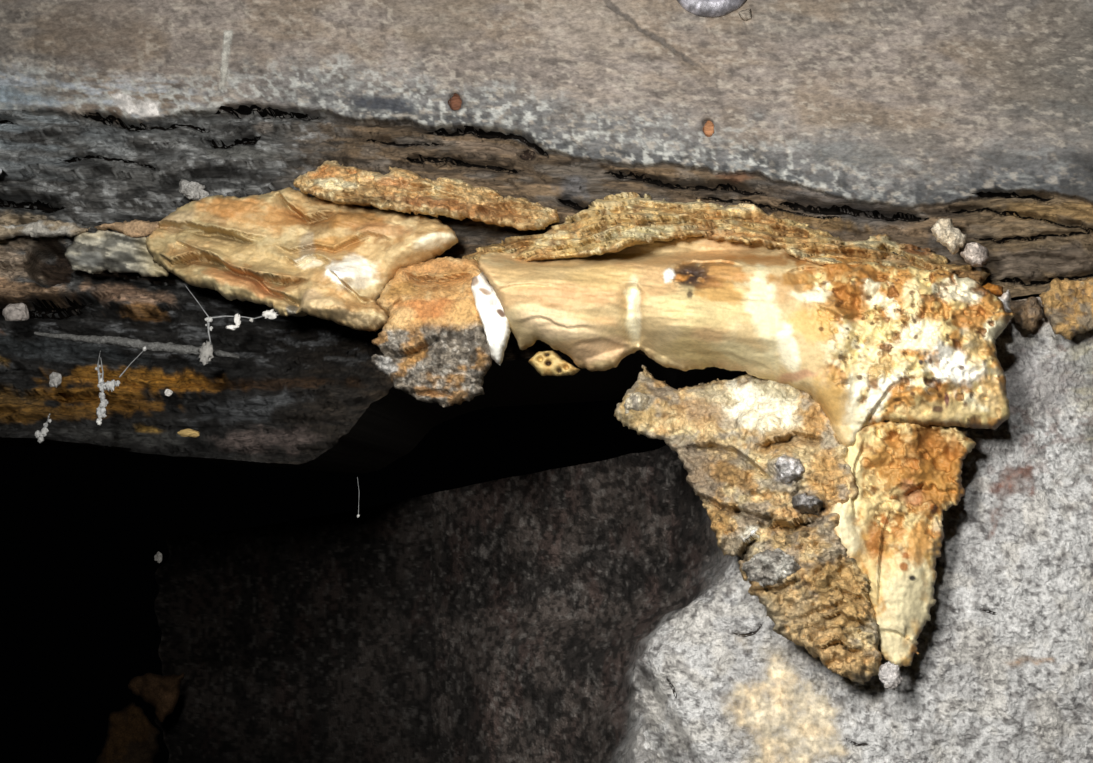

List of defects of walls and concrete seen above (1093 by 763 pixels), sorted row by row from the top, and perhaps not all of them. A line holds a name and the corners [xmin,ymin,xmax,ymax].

peeling [998,290,1011,312]
rust [998,467,1034,494]